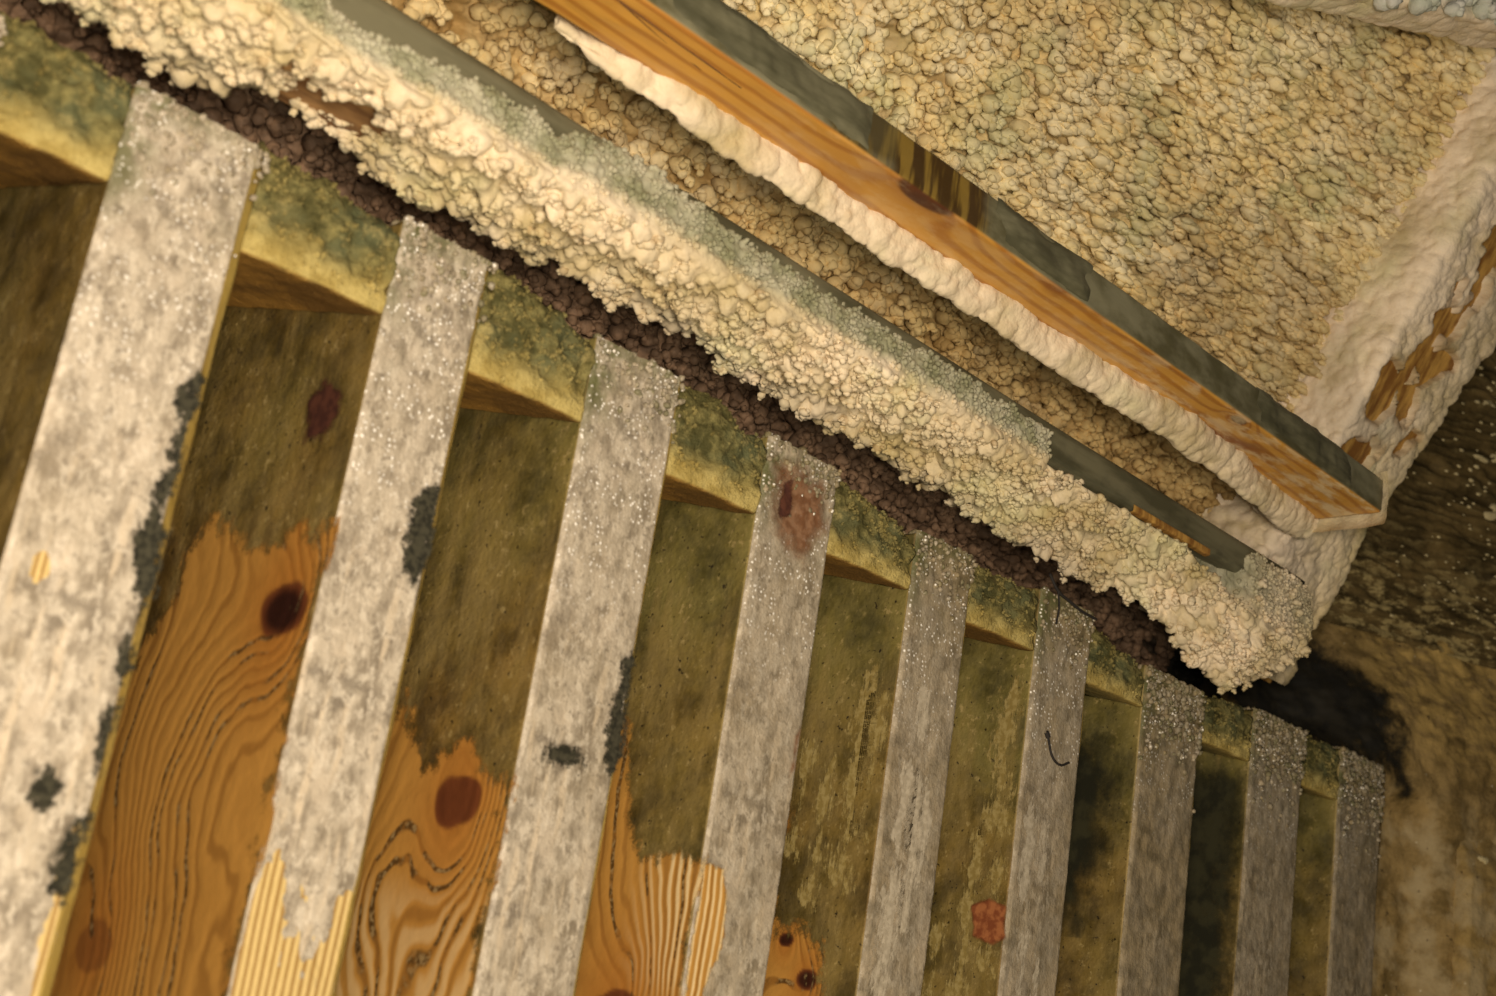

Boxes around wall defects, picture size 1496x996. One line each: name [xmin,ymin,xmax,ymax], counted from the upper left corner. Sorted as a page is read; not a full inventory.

damp [1266,0,1496,649]
damp [70,0,1412,798]
corrosion [774,467,823,553]
damp [25,764,65,813]
peeling [50,512,340,996]
damp [46,809,95,905]
corrosion [971,899,1006,944]